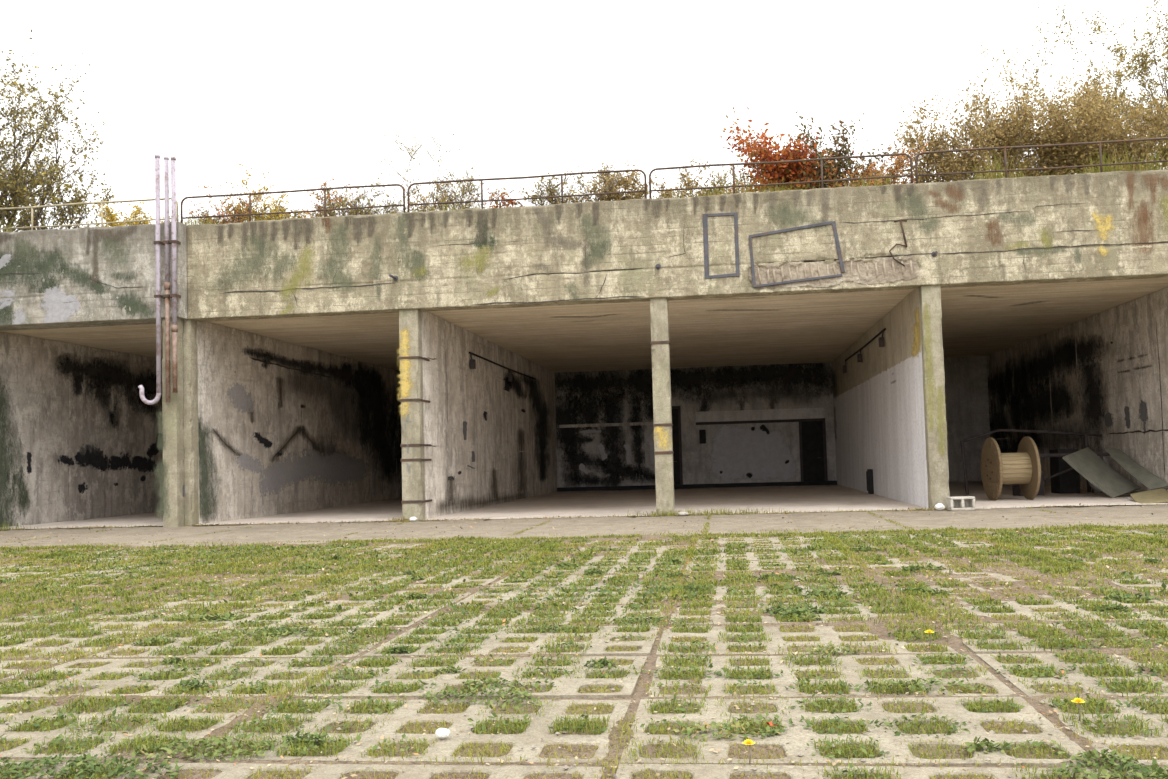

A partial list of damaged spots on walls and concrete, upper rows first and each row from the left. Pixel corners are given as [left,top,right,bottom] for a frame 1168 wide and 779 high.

corrosion [1128,174,1168,250]
damp [59,226,136,295]
spalling [749,219,920,289]
damp [213,429,241,457]
damp [272,427,326,461]